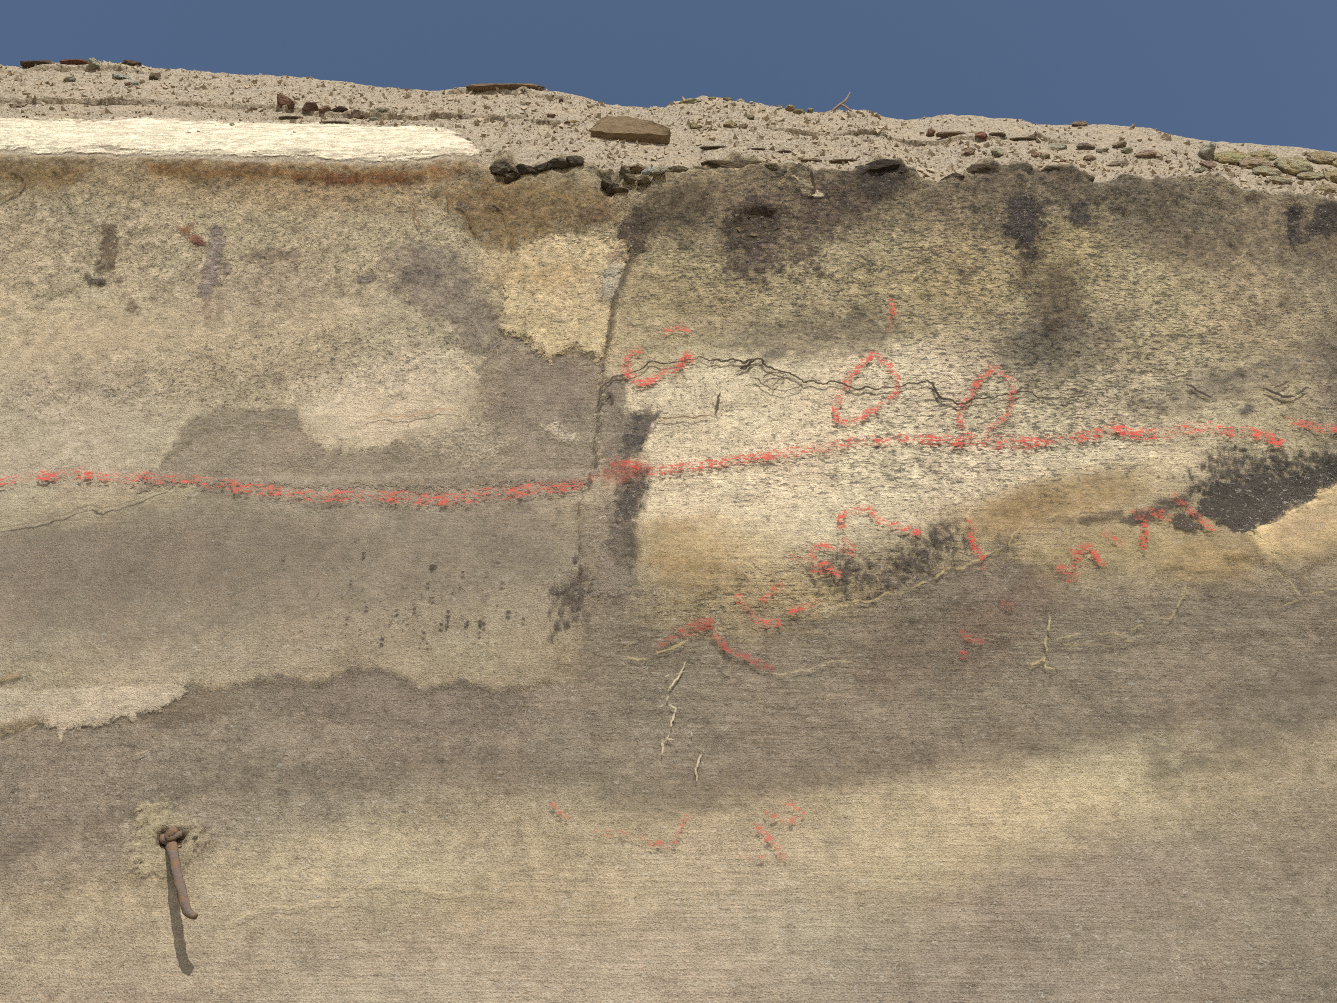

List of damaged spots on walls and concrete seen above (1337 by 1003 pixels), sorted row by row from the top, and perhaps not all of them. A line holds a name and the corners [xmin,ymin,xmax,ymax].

damp [617,154,1337,361]
crack [577,239,1100,554]
crack [1176,374,1211,398]
crack [1263,381,1309,398]
damp [0,224,1337,851]